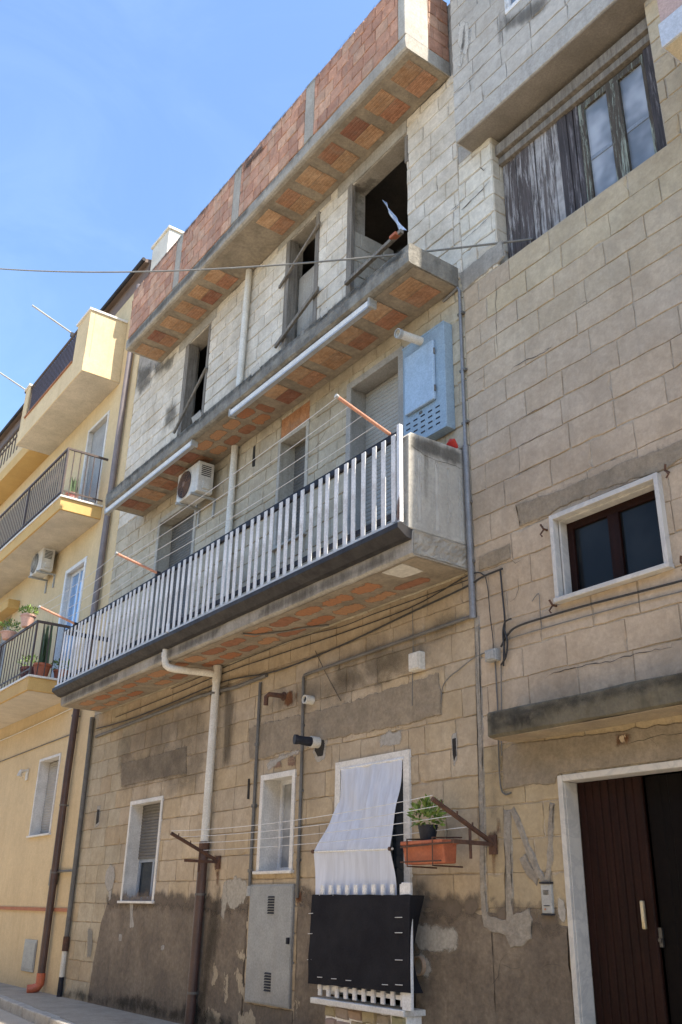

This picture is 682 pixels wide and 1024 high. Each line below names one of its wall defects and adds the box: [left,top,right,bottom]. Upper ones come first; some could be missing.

damp [114,375,252,489]
crack [546,647,671,678]
peeling [221,876,247,919]
peeling [415,924,458,977]
damp [106,996,223,1024]